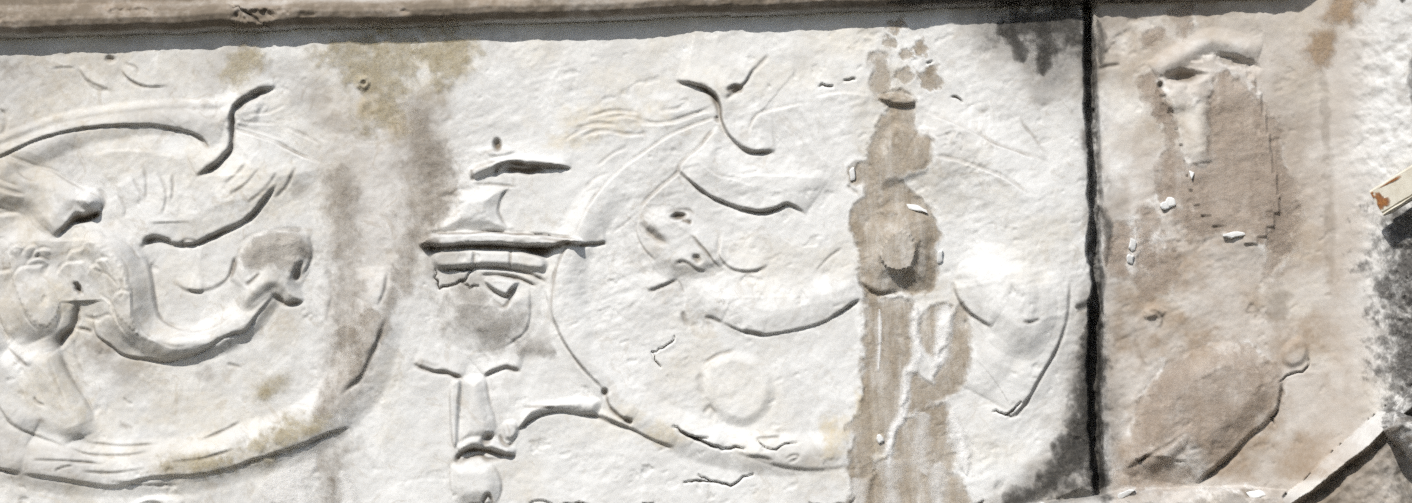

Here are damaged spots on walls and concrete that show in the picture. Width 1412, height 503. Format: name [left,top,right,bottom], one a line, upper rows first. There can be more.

water stain [350,126,454,341]
water stain [887,0,1141,503]
spalling [1105,70,1295,298]
water stain [1358,209,1412,428]
peeling [1201,490,1266,503]